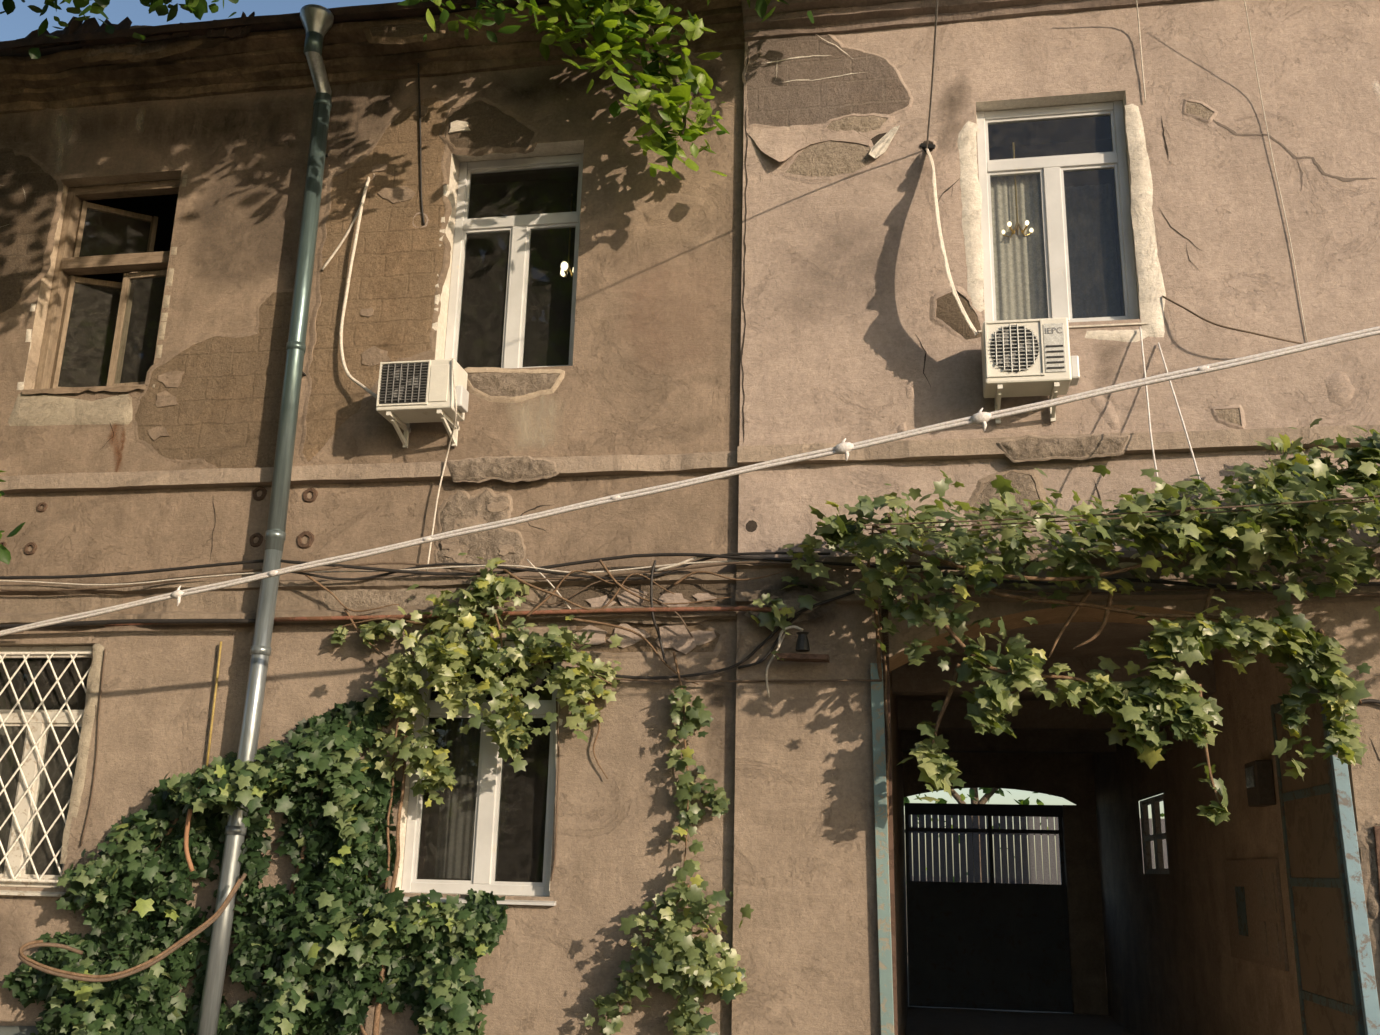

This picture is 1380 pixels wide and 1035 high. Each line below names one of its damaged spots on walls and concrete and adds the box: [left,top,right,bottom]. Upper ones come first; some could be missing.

spalling [742,34,913,184]
crack [1161,116,1171,160]
crack [1213,119,1371,190]
spalling [0,146,63,319]
spalling [132,287,294,469]
spalling [298,94,540,466]
spalling [929,286,984,343]
crack [1161,211,1202,270]
spalling [316,456,558,610]
spalling [551,571,736,660]